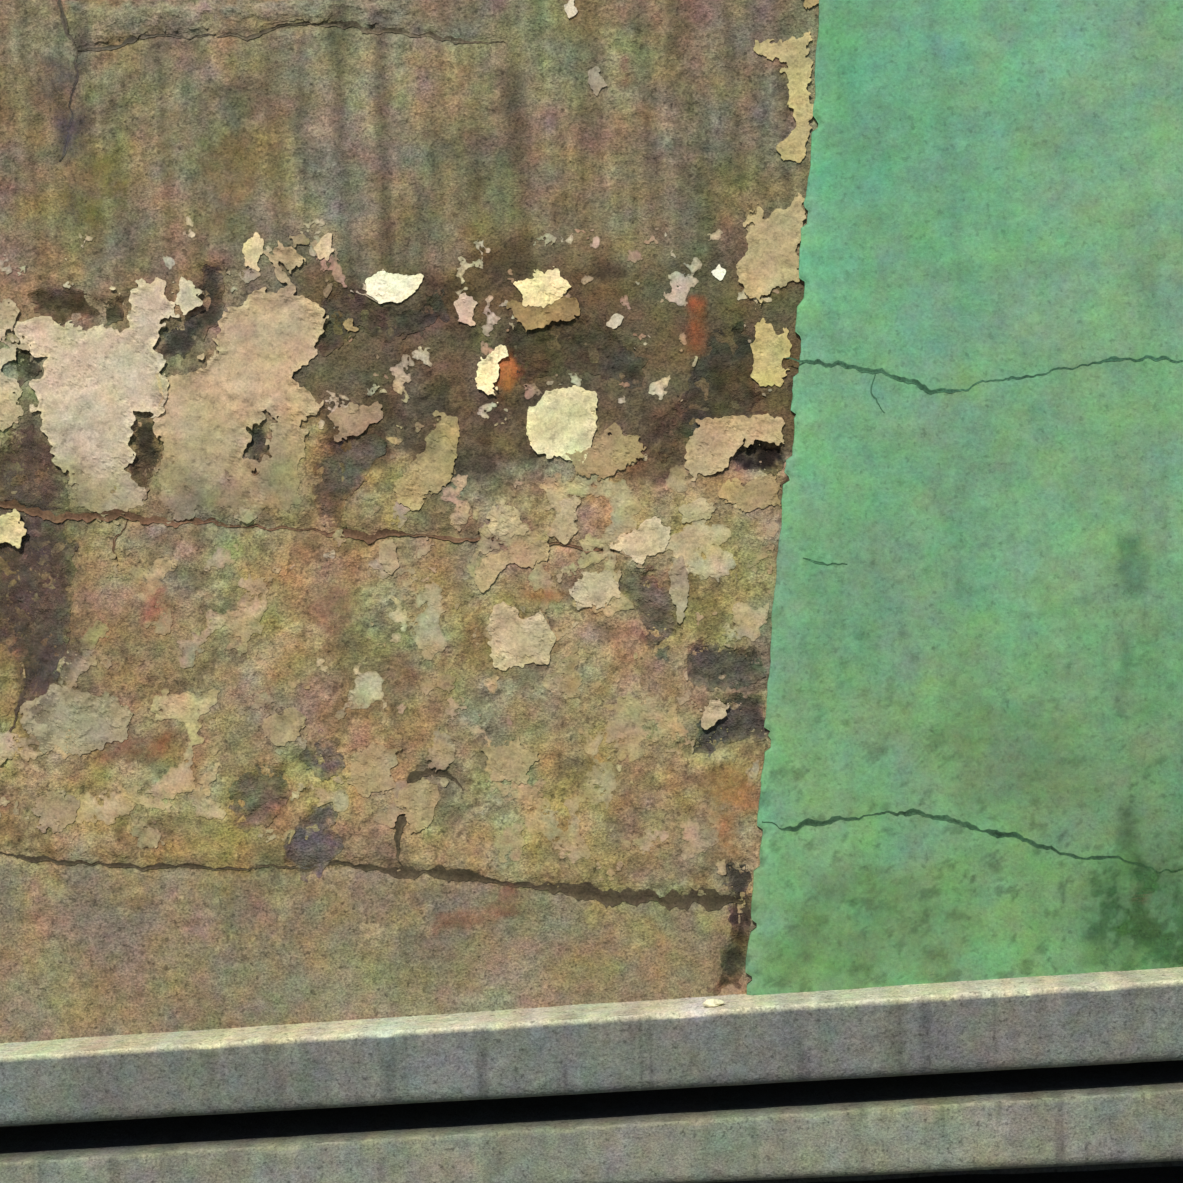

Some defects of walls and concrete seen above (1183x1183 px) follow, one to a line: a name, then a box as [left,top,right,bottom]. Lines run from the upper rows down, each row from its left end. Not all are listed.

crack [57,0,504,161]
peeling [753,31,814,163]
crack [787,355,1183,413]
damp [5,508,50,561]
crack [0,499,505,560]
crack [549,541,601,553]
crack [0,768,743,911]
crack [764,808,1183,873]
spalling [707,859,752,995]